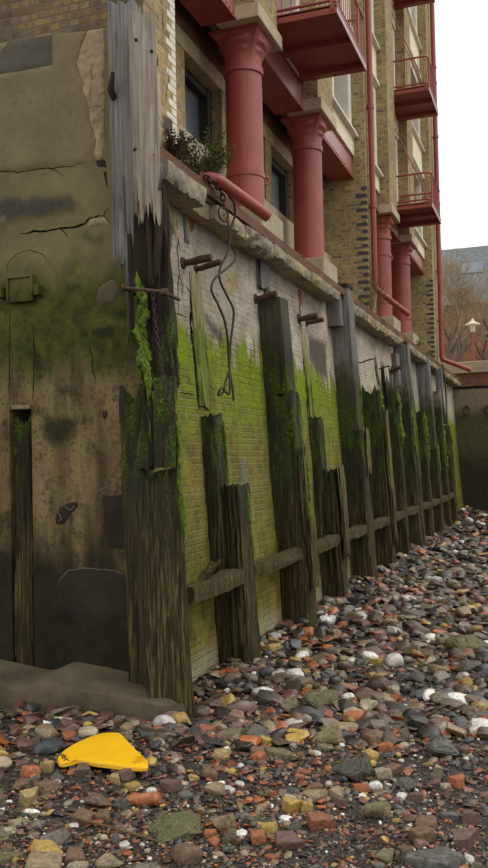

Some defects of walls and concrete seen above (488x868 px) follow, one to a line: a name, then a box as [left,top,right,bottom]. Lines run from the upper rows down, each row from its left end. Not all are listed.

crack [1,163,80,176]
crack [7,209,109,267]